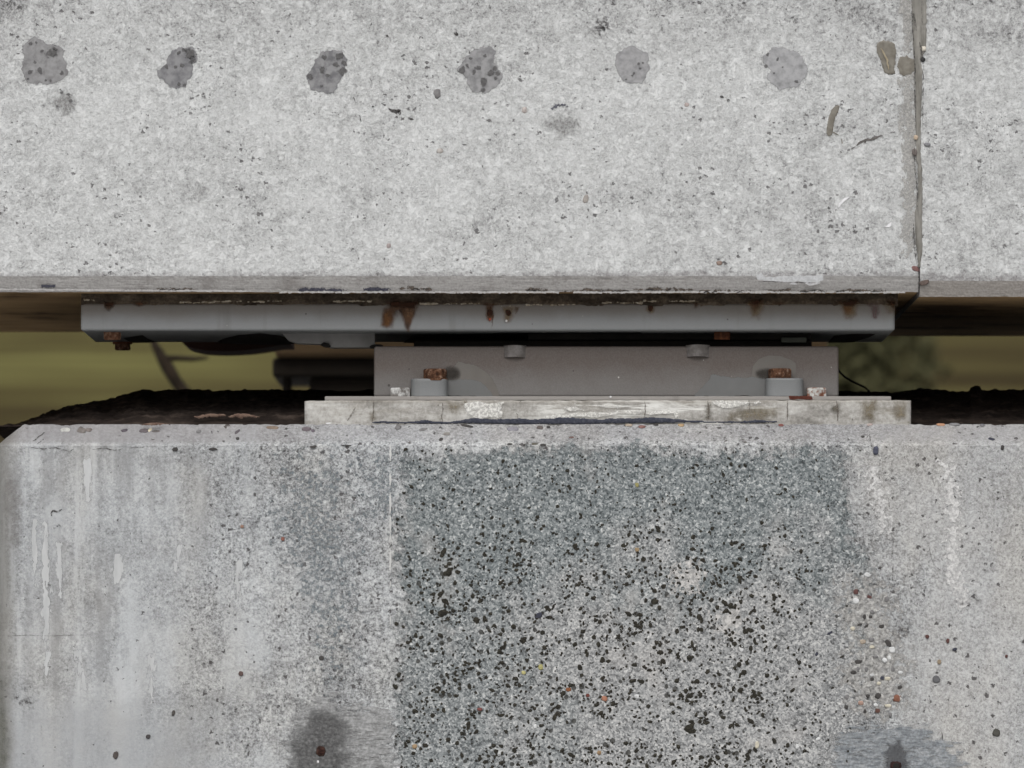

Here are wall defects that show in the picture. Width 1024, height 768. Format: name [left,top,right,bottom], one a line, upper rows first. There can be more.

rust [382,301,418,331]
rust [486,304,518,322]
water stain [110,553,124,584]
water stain [29,518,63,676]